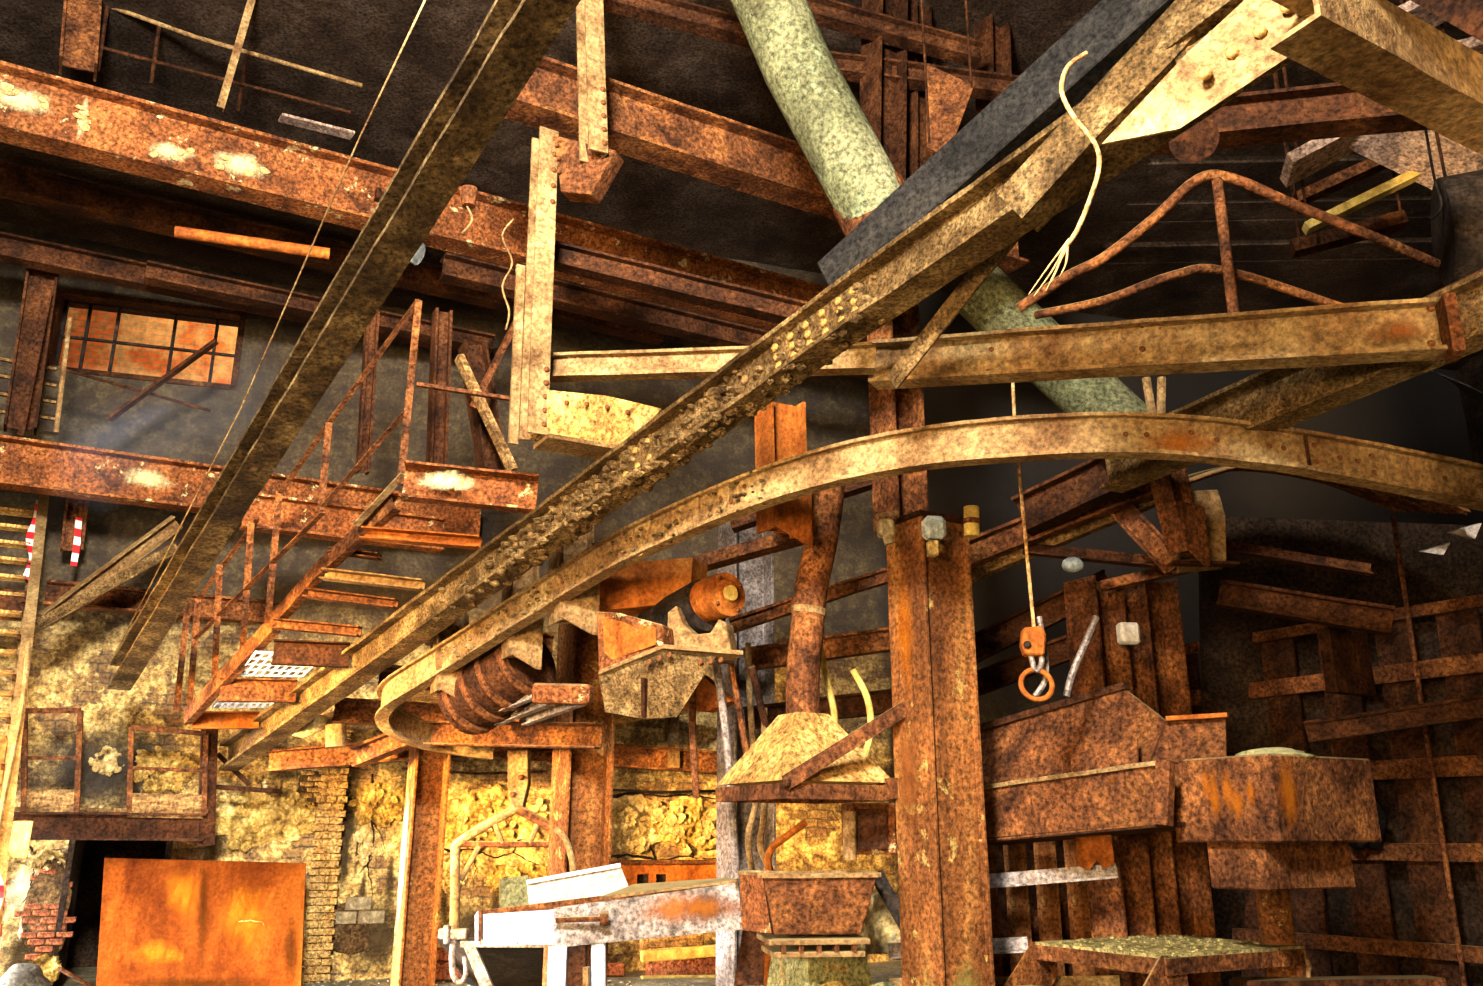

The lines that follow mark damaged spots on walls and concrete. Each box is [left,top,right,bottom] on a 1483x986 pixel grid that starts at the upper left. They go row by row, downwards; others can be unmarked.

corrosion [423,473,469,489]
corrosion [1203,776,1252,810]
corrosion [1282,776,1294,810]